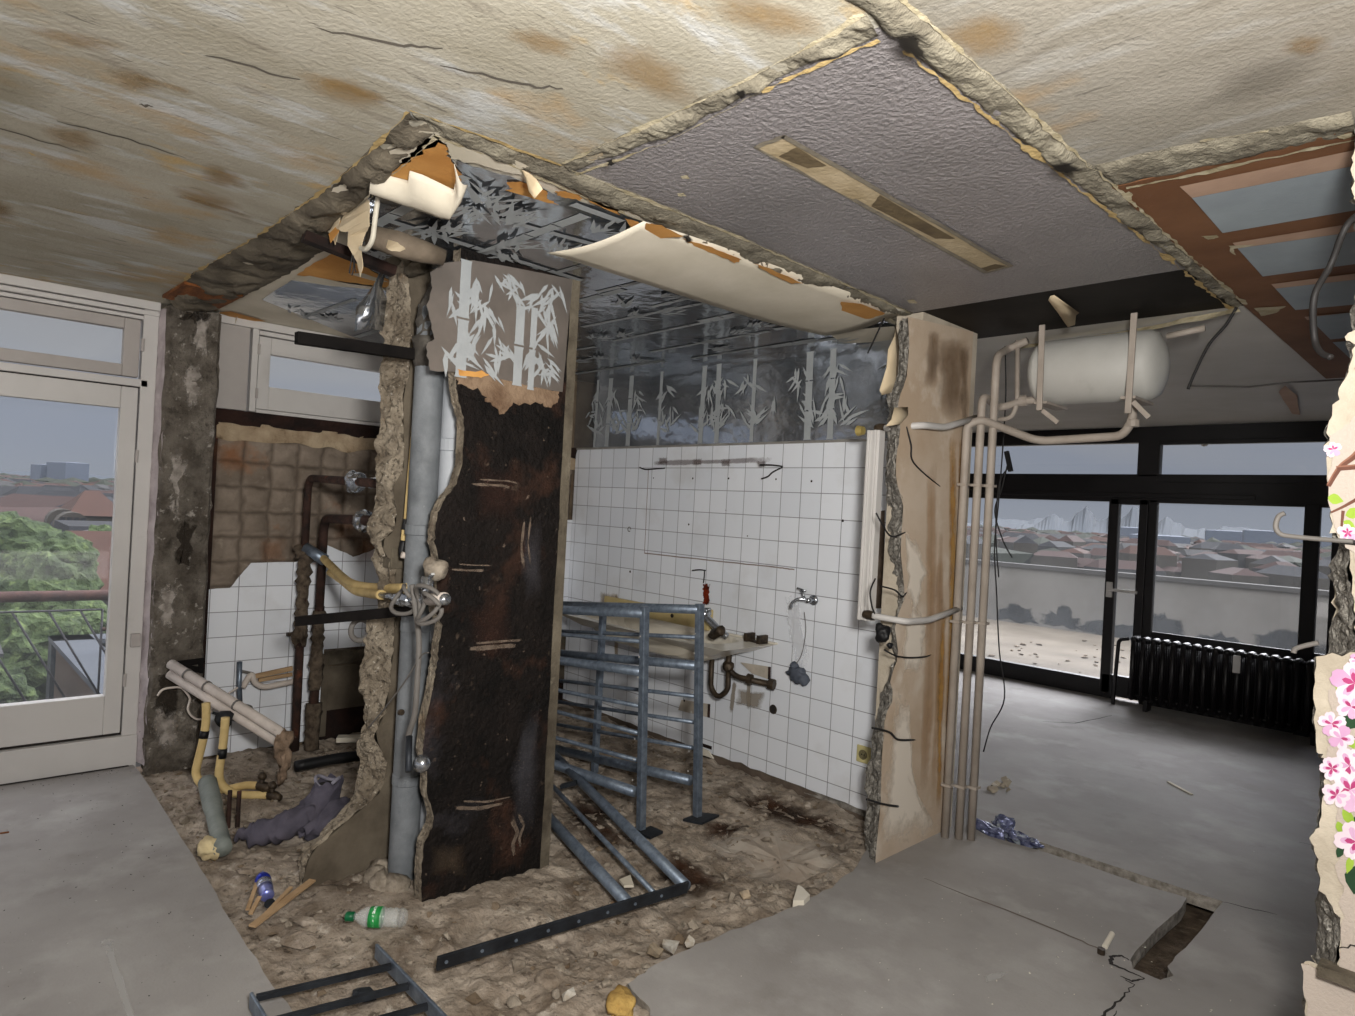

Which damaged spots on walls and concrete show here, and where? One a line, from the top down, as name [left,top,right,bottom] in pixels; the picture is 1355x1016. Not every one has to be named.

peeling [761,33,1234,309]
spalling [184,368,201,406]
spalling [193,312,211,354]
flaking render [456,369,559,414]
spalling [1345,295,1355,378]
spalling [167,455,186,511]
spalling [158,586,177,627]
peeling [203,261,412,888]
spalling [864,299,931,862]
spalling [1312,511,1355,732]
spalling [1309,748,1341,964]
crack [925,878,1145,1016]